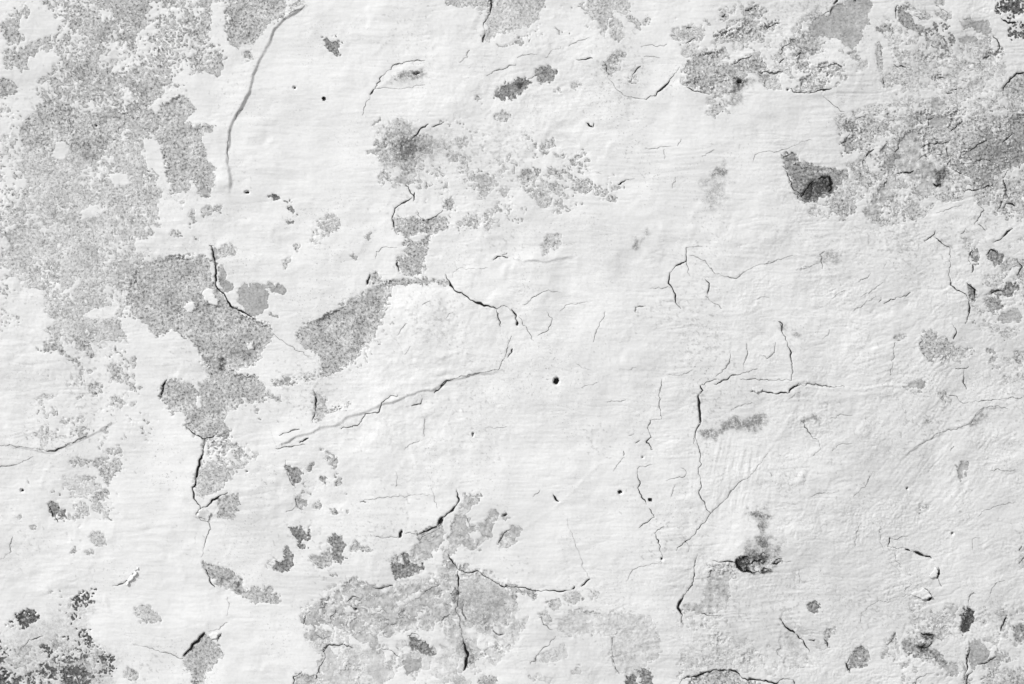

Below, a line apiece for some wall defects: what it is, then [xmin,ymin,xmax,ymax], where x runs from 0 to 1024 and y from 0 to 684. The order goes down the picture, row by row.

peeling [671,0,1024,227]
crack [722,9,1023,339]
crack [209,245,254,319]
peeling [0,0,625,555]
crack [341,277,583,447]
crack [635,255,823,311]
crack [616,321,843,622]
peeling [0,588,139,684]
crack [293,585,392,683]
peeling [266,493,663,684]
crack [415,527,589,671]
peeling [847,567,1024,684]